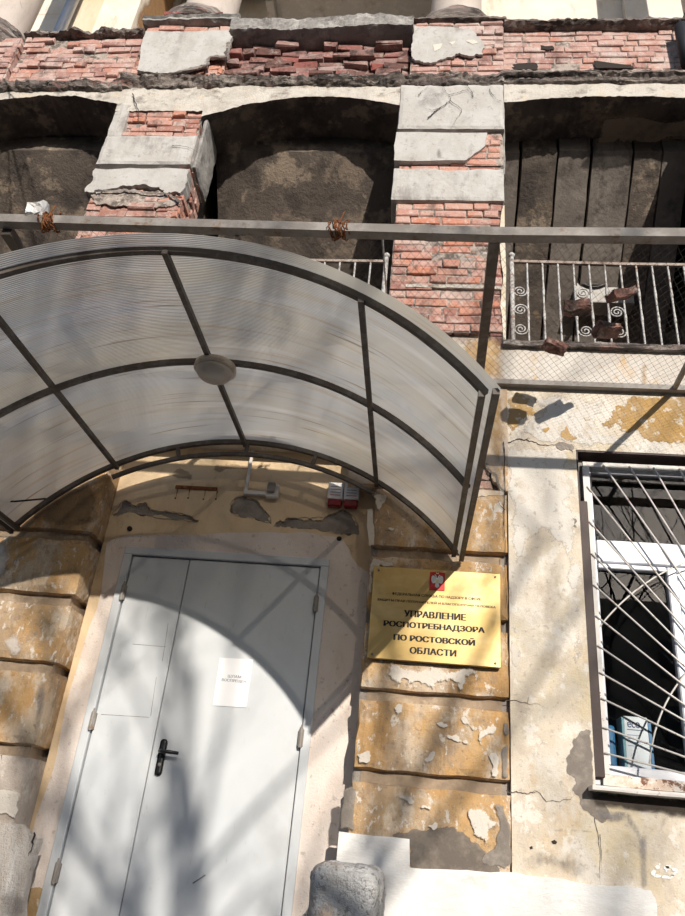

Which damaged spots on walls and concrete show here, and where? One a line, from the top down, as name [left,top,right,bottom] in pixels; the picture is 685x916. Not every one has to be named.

spalling [594,61,634,69]
crack [418,82,493,121]
flaking render [112,500,198,523]
flaking render [230,494,387,545]
peeling [479,392,685,605]
peeling [511,627,533,667]
peeling [388,664,476,690]
peeling [437,716,509,743]
peeling [358,751,371,763]
peeling [489,752,499,776]
peeling [0,789,19,818]
crack [506,790,572,802]